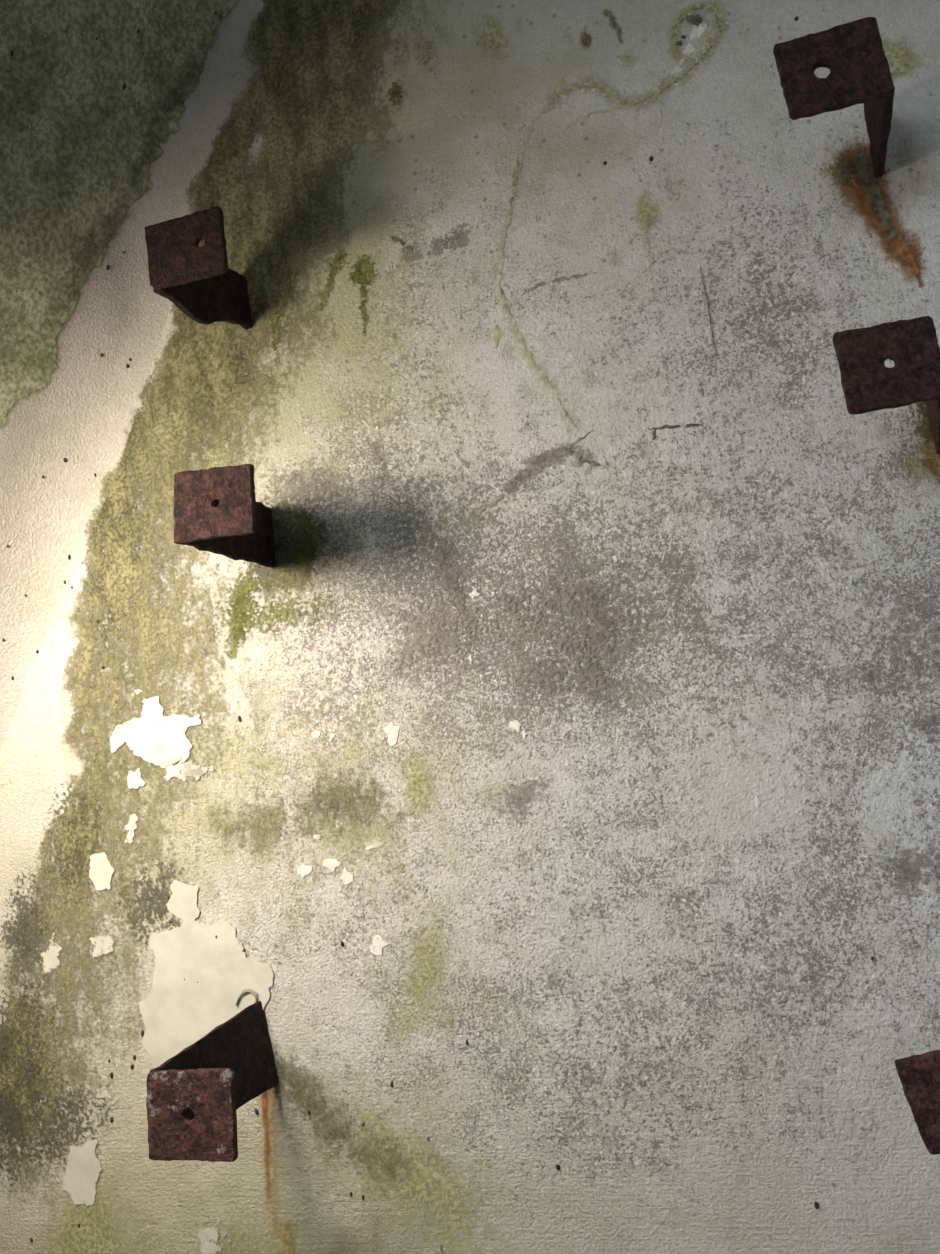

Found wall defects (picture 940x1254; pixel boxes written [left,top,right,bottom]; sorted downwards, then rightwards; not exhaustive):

damp [186,0,292,213]
corrosion [829,145,923,287]
damp [84,376,152,553]
damp [226,573,259,659]
peeling [110,689,213,789]
peeling [40,933,62,973]
damp [0,872,110,1191]
peeling [89,852,114,891]
peeling [89,935,114,957]
damp [114,855,184,952]
peeling [139,880,273,1068]
corrosion [262,1088,293,1254]